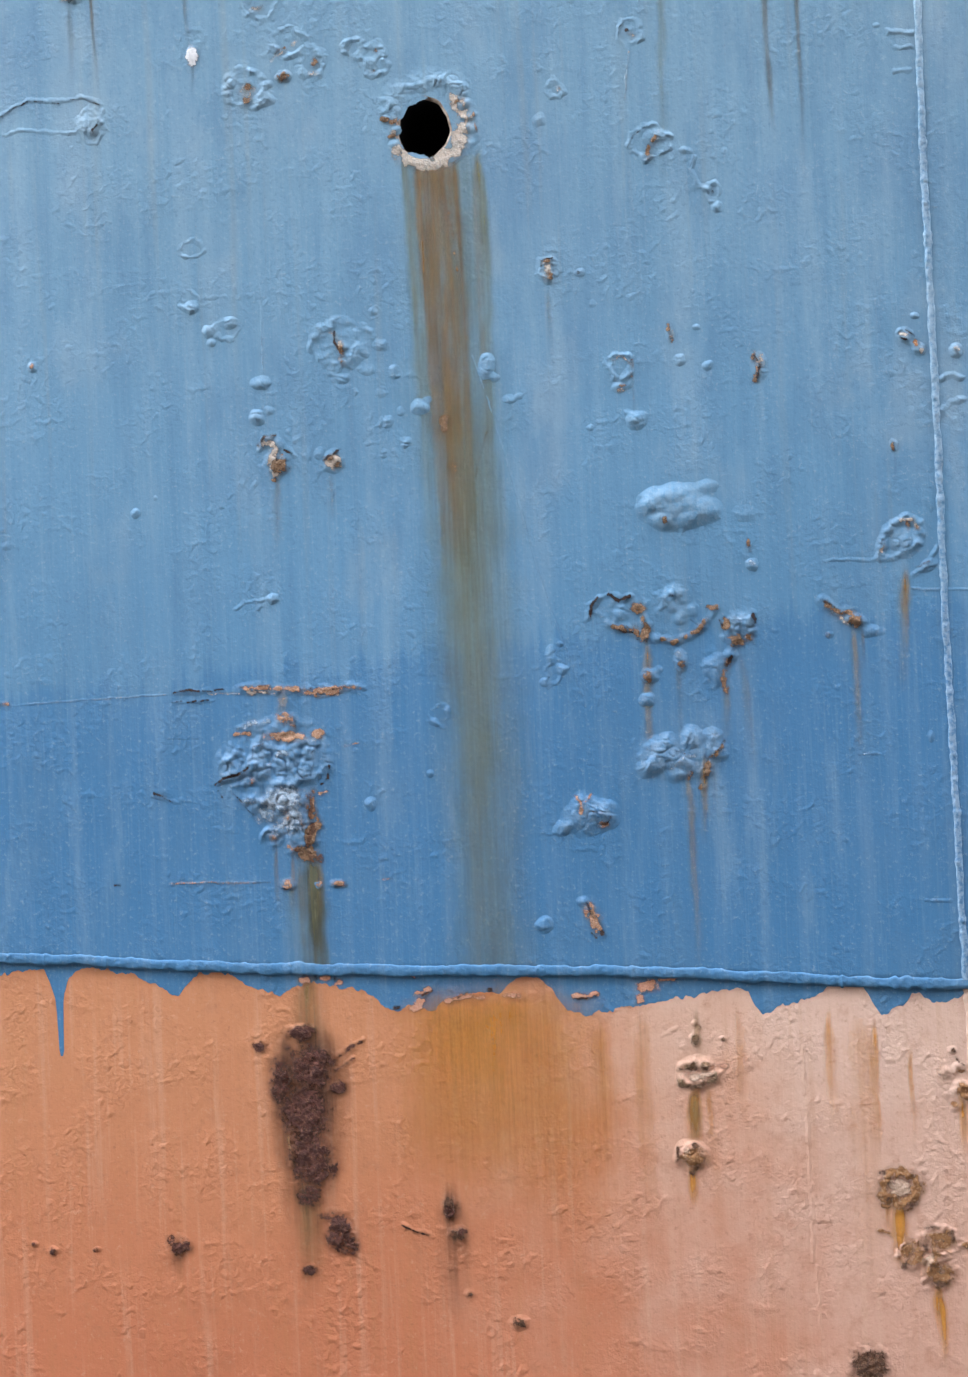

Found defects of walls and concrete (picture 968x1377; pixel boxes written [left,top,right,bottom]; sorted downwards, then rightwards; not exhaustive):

peeling [380,93,483,172]
rust [813,593,886,639]
rust [637,647,688,708]
spalling [299,975,343,985]
spalling [393,976,520,1012]
spalling [571,991,599,1000]
spalling [636,978,677,1004]
rust [934,1045,968,1118]
rust [672,1138,712,1193]
rust [876,1164,968,1341]
rust [844,1341,894,1377]